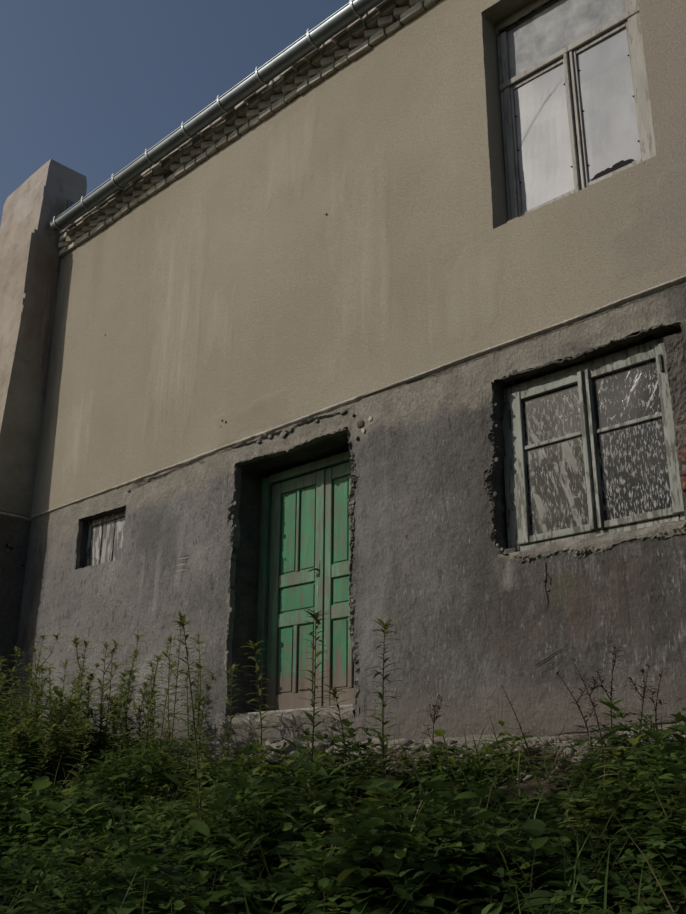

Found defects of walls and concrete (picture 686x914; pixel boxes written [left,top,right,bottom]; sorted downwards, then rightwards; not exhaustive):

spalling [224,414,372,712]
crack [542,559,551,615]
spalling [482,323,686,563]